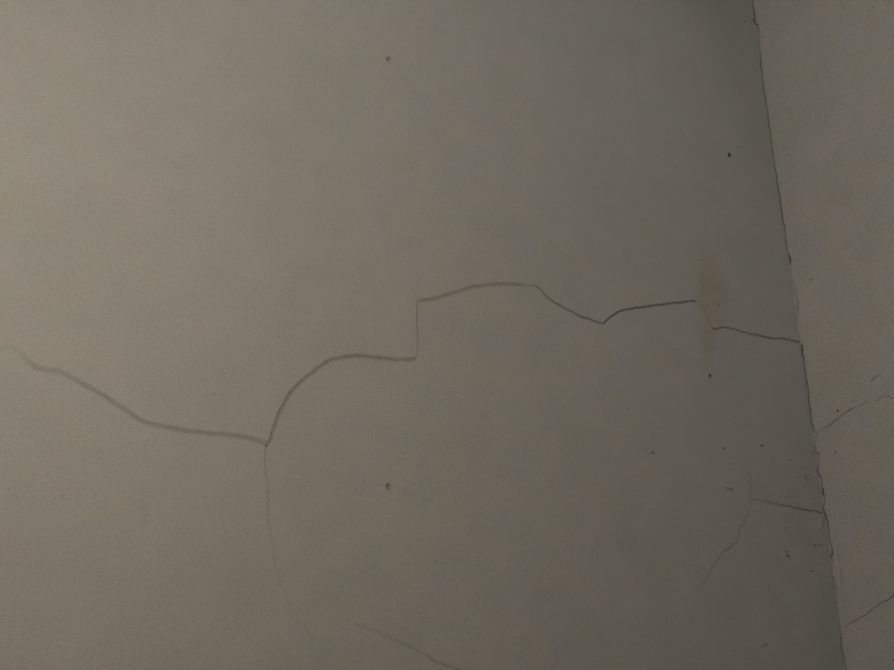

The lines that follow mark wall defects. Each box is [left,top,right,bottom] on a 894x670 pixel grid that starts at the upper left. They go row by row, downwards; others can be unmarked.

crack [711,326,804,358]
crack [0,281,697,641]
crack [699,492,824,589]